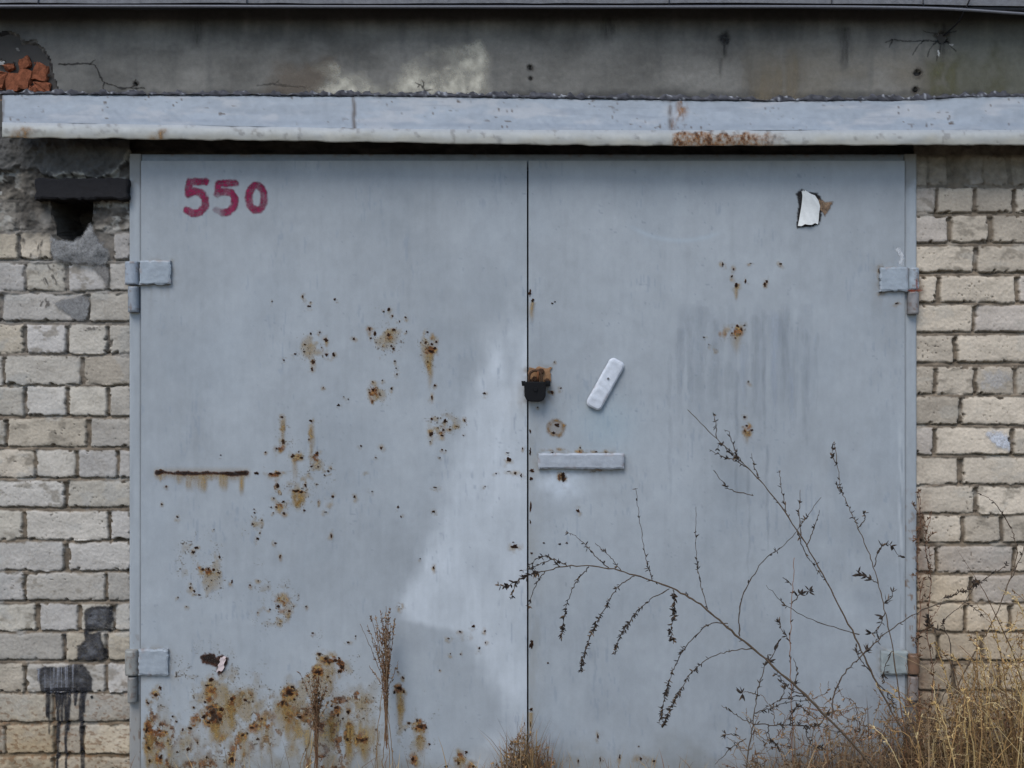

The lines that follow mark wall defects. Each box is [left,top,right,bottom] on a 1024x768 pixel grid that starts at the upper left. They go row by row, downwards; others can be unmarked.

spalling [0,31,59,101]
crack [58,60,145,89]
damp [324,66,369,94]
damp [398,43,485,94]
rust [673,131,769,146]
rust [368,308,407,375]
rust [420,331,437,400]
rust [155,416,331,515]
peeling [200,653,228,675]
rust [143,653,381,768]
rust [393,671,431,766]
rust [444,751,476,768]